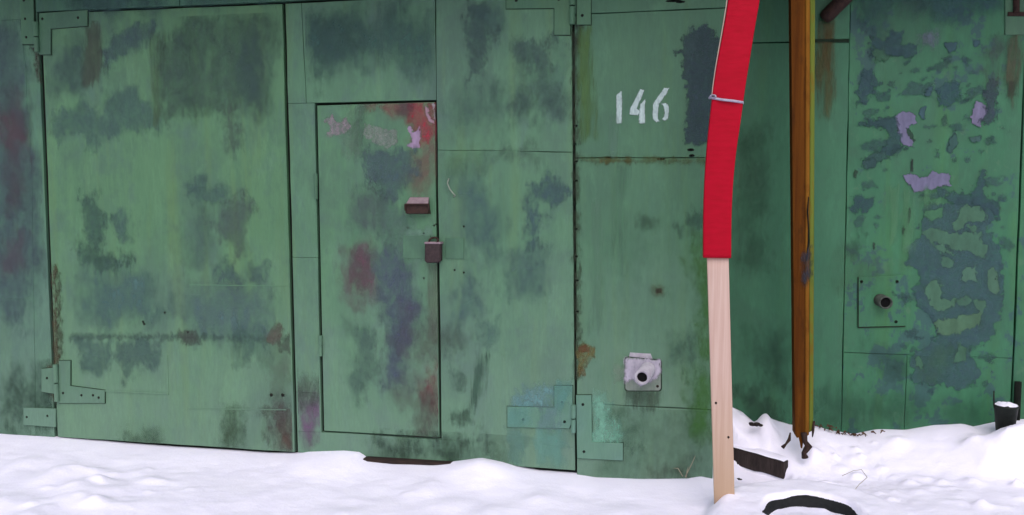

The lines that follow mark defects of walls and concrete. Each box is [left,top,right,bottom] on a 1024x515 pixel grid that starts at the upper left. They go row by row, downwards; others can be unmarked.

peeling [363,103,436,149]
peeling [847,30,999,227]
rust [571,155,705,378]
peeling [893,169,1014,394]